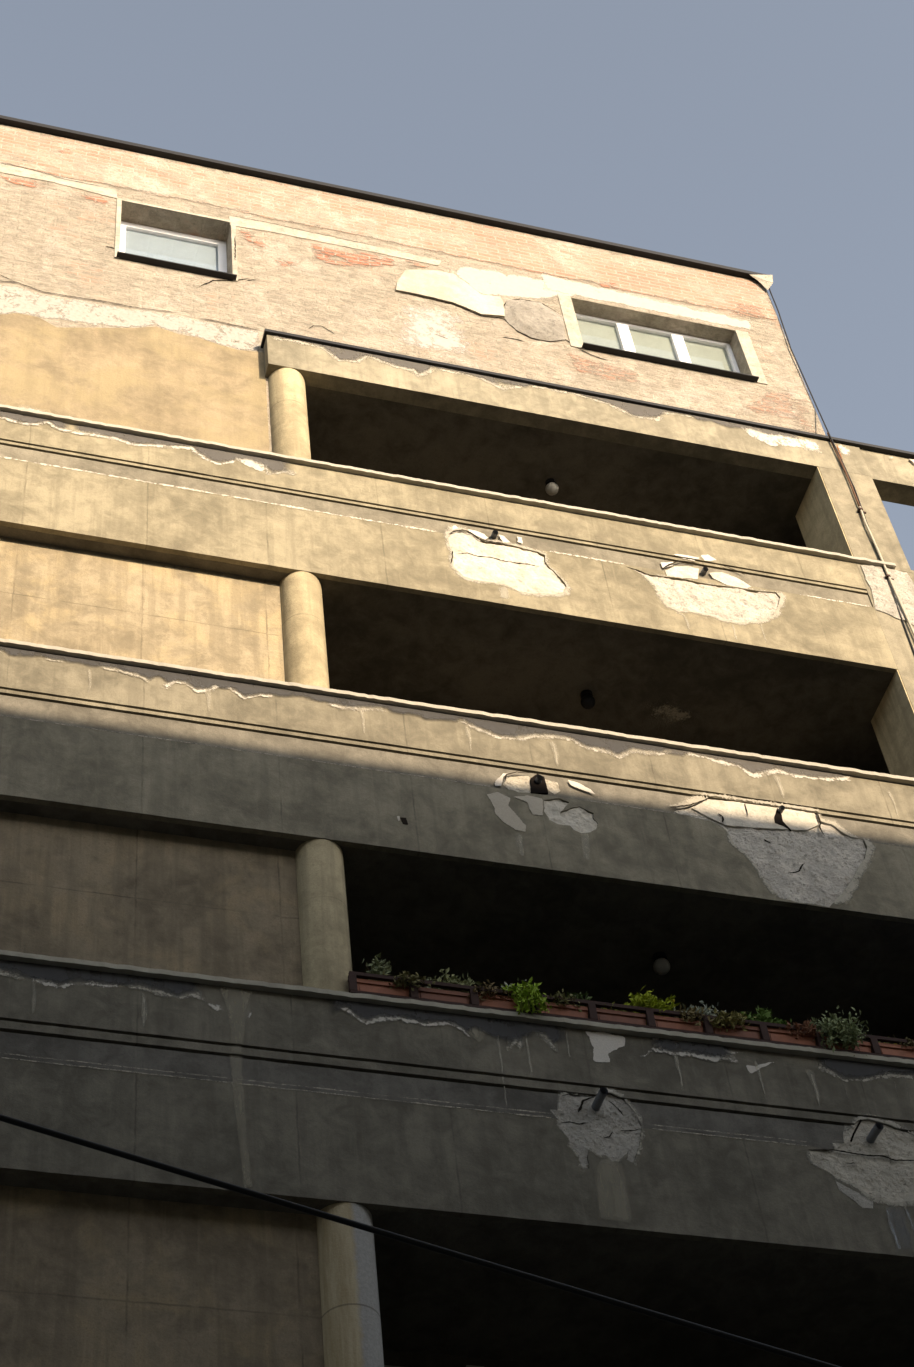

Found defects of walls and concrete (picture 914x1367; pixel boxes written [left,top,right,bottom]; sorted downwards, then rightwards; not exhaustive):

peeling [0,126,777,352]
spalling [445,525,571,598]
spalling [635,554,785,640]
spalling [860,565,914,626]
peeling [487,771,598,833]
spalling [670,793,876,907]
peeling [586,1031,625,1062]
spalling [550,1089,644,1220]
spalling [809,1114,914,1247]